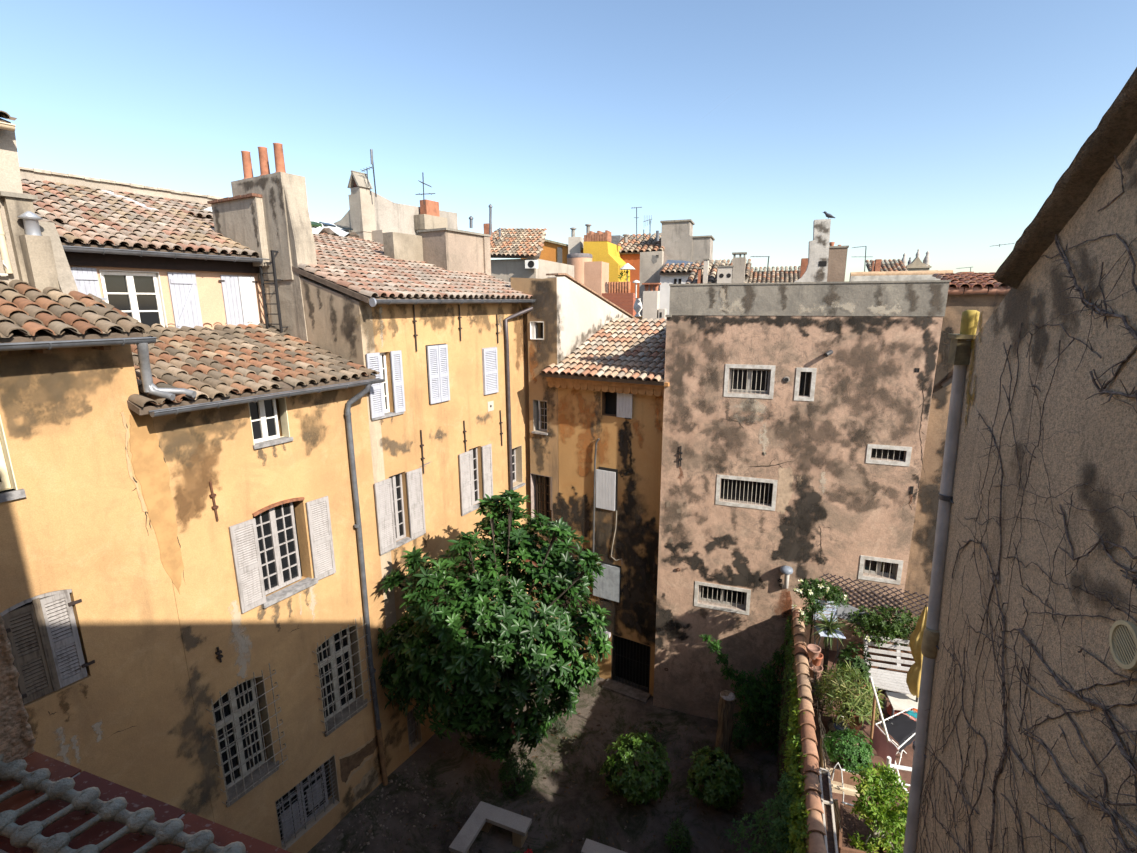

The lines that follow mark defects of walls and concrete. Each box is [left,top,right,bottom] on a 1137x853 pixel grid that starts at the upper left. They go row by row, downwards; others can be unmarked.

leakage [801,224,854,313]
leakage [0,350,118,437]
leakage [160,403,245,524]
leakage [540,283,953,653]